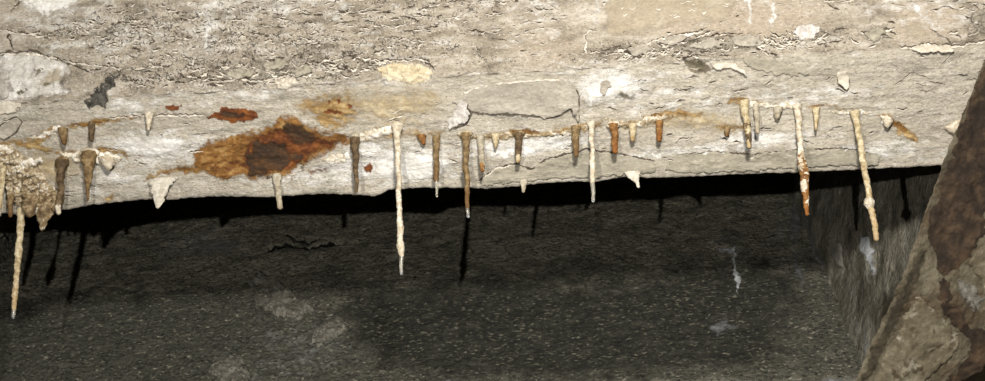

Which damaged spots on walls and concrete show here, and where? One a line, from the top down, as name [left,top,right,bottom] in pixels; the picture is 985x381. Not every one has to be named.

crack [0,0,173,72]
rust [0,126,75,154]
damp [0,144,81,207]
efflorescence [31,125,61,139]
rust [67,117,133,129]
spalling [84,75,118,109]
damp [96,135,185,166]
rust [144,94,356,182]
damp [358,92,436,142]
damp [374,149,448,179]
damp [457,111,734,159]
damp [749,101,795,110]